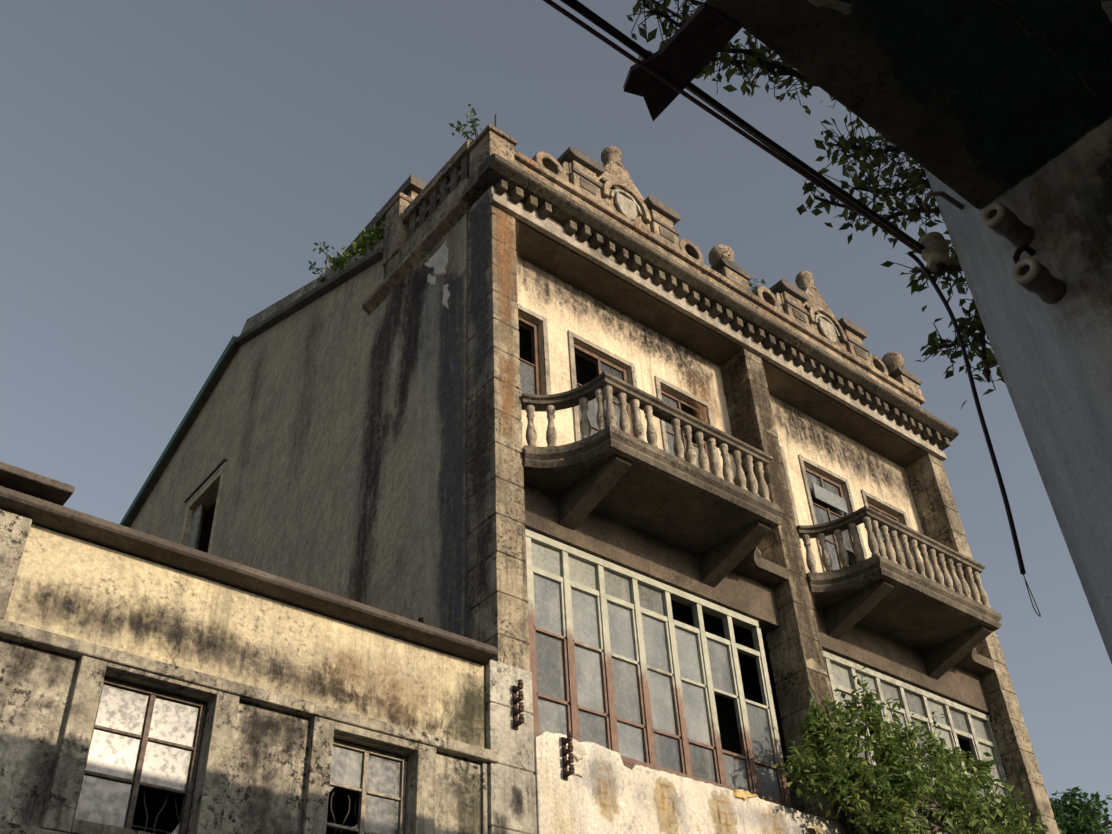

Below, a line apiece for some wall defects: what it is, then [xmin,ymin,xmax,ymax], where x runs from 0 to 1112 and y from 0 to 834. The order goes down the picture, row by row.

leakage [829,0,1112,277]
peeling [424,237,450,309]
leakage [350,197,490,637]
leakage [518,259,908,734]
leakage [8,644,64,680]
leakage [23,586,487,745]
spalling [570,739,586,778]
spalling [733,789,758,801]